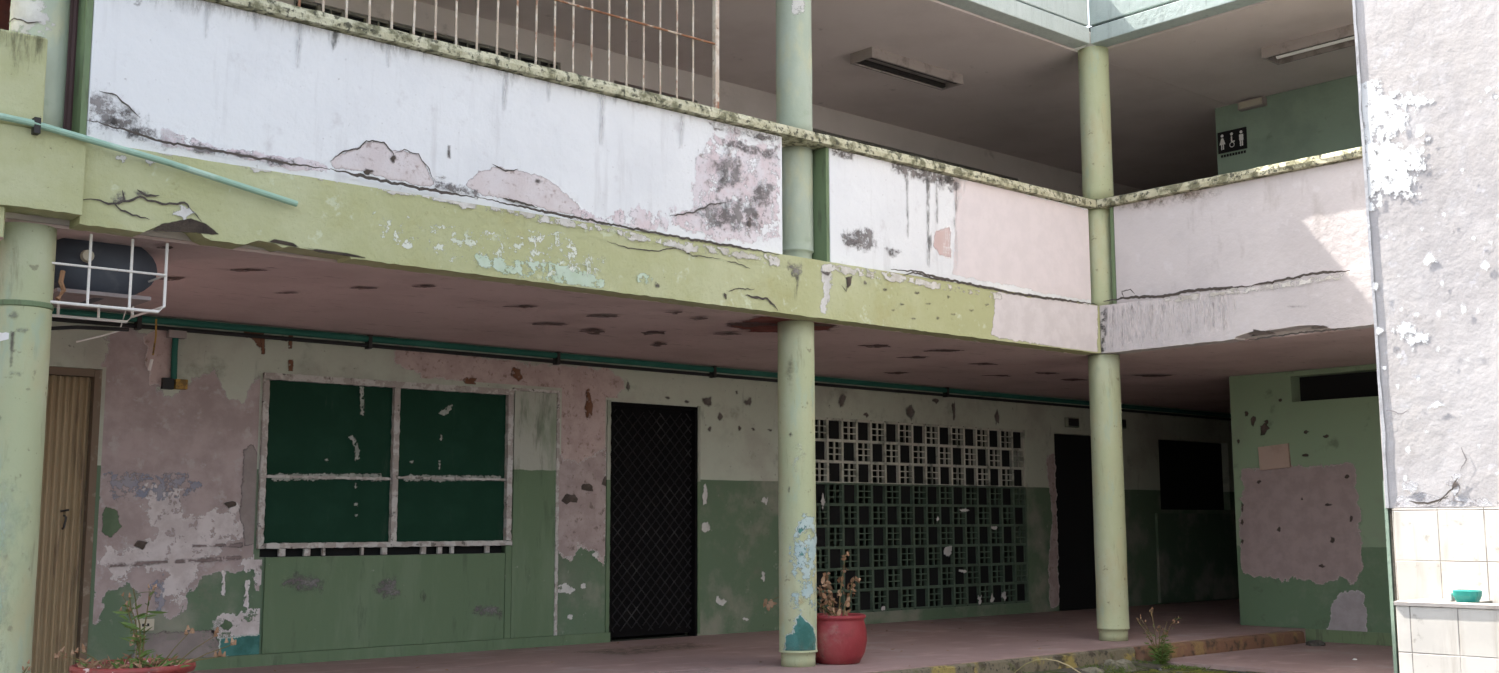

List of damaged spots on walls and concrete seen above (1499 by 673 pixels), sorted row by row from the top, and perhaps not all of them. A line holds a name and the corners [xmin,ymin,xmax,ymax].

peeling [8,0,61,35]
flaking render [331,140,444,186]
crack [83,120,780,311]
peeling [373,211,606,288]
flaking render [466,164,580,214]
peeling [599,125,781,245]
crack [822,264,1350,305]
peeling [1361,78,1434,227]
peeling [1375,307,1448,370]
peeling [93,327,382,656]
peeling [394,345,630,565]
crack [1402,447,1467,503]